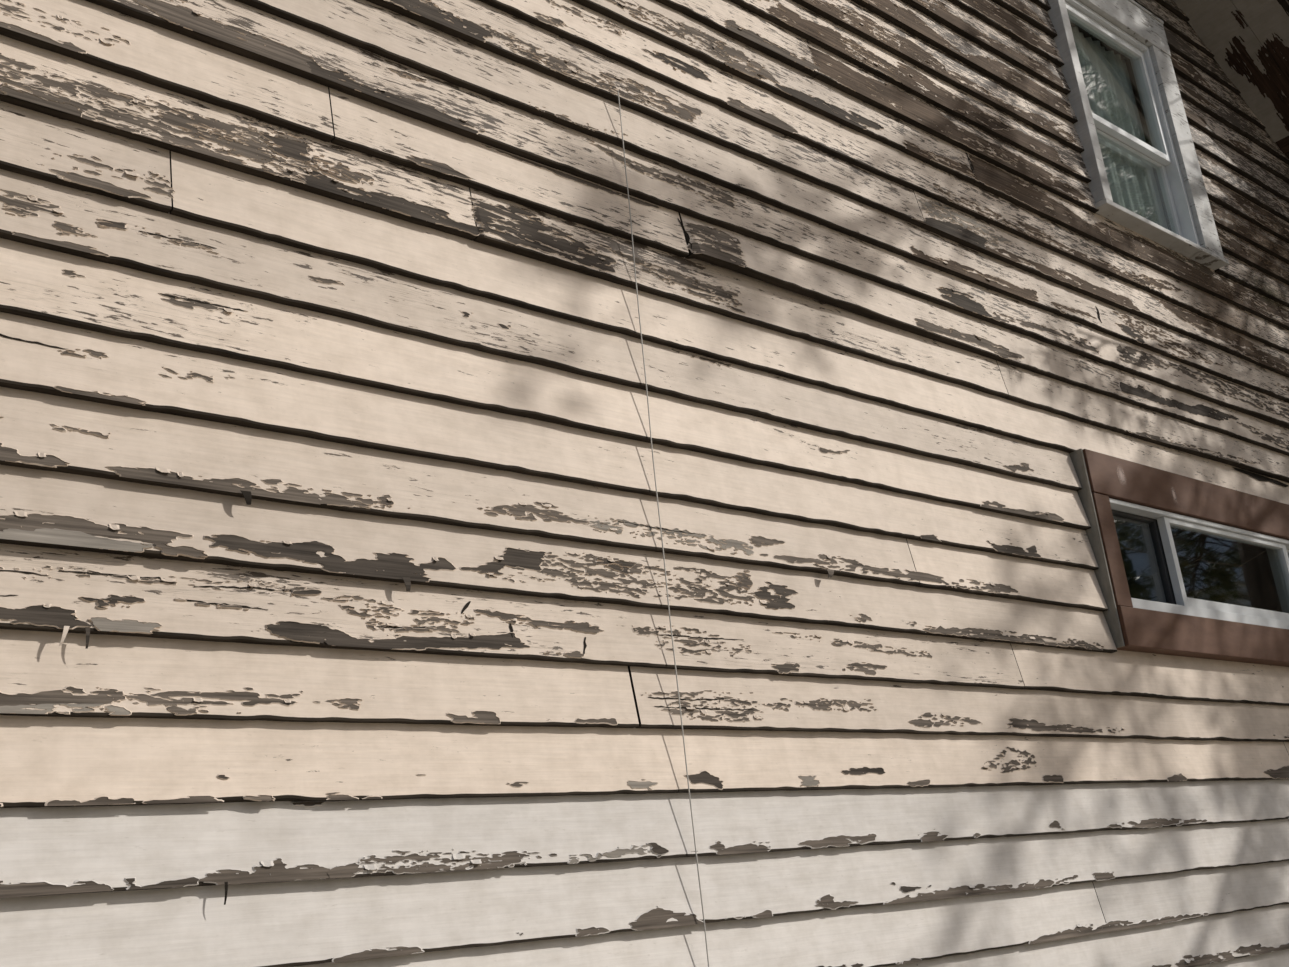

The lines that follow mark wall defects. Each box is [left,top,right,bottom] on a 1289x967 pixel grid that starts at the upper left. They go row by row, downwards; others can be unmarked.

peeling [0,0,131,54]
peeling [133,0,703,210]
peeling [0,53,745,316]
peeling [529,0,1289,451]
peeling [0,501,1020,610]
peeling [0,565,604,659]
peeling [631,625,752,657]
peeling [0,685,363,716]
peeling [640,690,877,723]
peeling [981,746,1064,783]
peeling [0,842,669,898]
peeling [1151,942,1289,967]